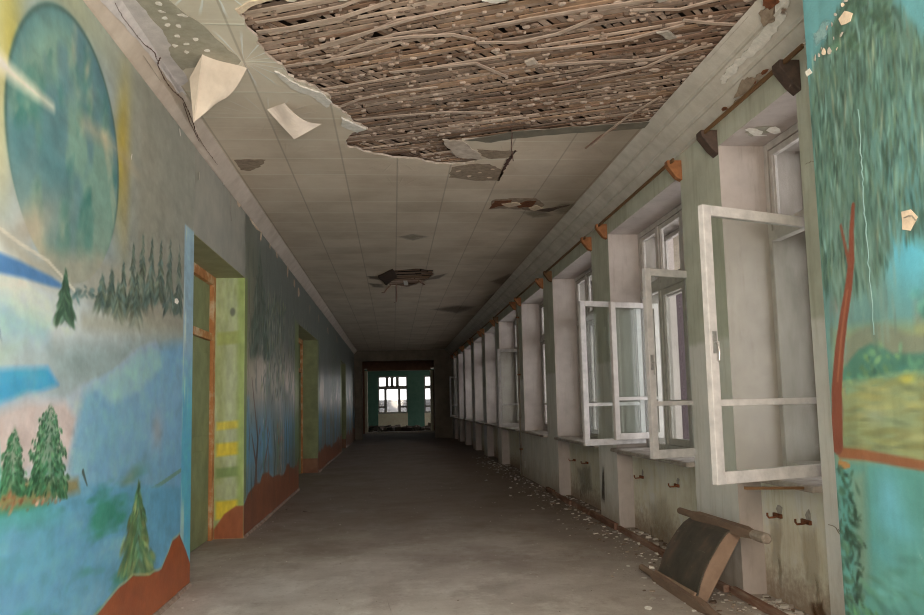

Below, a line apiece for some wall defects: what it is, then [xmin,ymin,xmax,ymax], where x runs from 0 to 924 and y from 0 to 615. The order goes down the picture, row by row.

crack [115,3,216,163]
peeling [100,0,241,95]
spalling [720,0,790,111]
peeling [805,0,853,76]
peeling [234,159,265,171]
peeling [442,139,517,181]
peeling [745,126,781,137]
peeling [901,209,918,231]